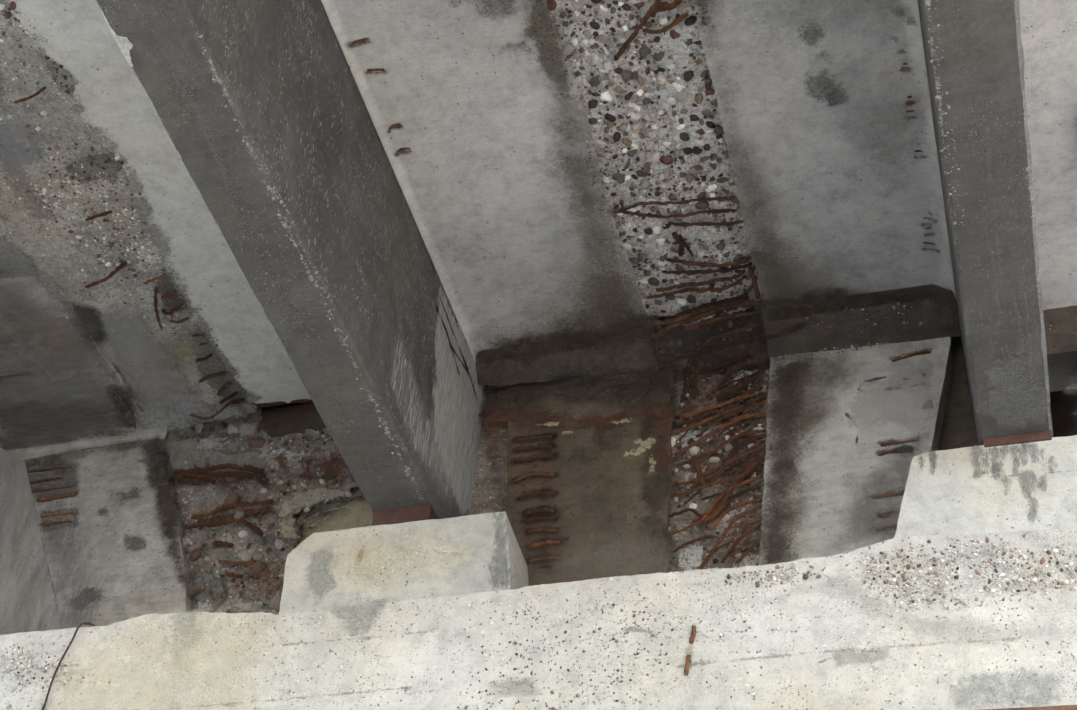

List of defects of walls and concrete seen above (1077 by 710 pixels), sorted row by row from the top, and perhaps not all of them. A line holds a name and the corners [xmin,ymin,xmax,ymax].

corrosion [349,38,370,47]
leakage [801,23,824,57]
leakage [806,70,845,106]
leakage [0,284,187,583]
spalling [0,0,363,710]
spalling [233,119,424,501]
spalling [457,0,1077,710]
leakage [755,229,1053,564]